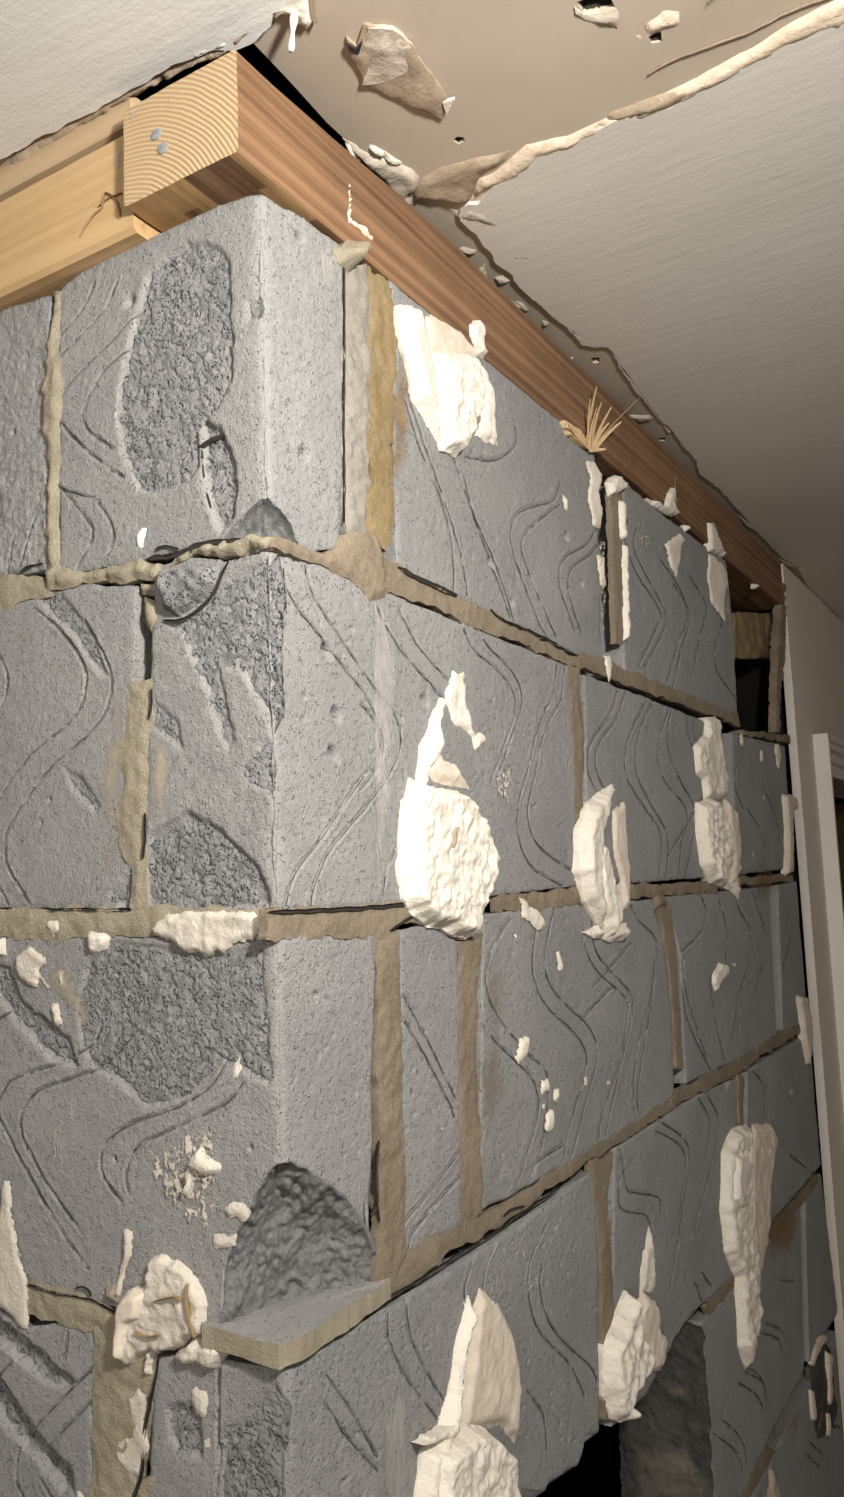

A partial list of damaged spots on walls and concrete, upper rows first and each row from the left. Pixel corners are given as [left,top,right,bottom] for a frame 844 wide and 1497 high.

peeling [0,32,249,167]
peeling [272,0,317,53]
peeling [342,0,844,226]
water stain [445,671,486,750]
crack [26,1283,199,1497]
spalling [618,1322,714,1497]